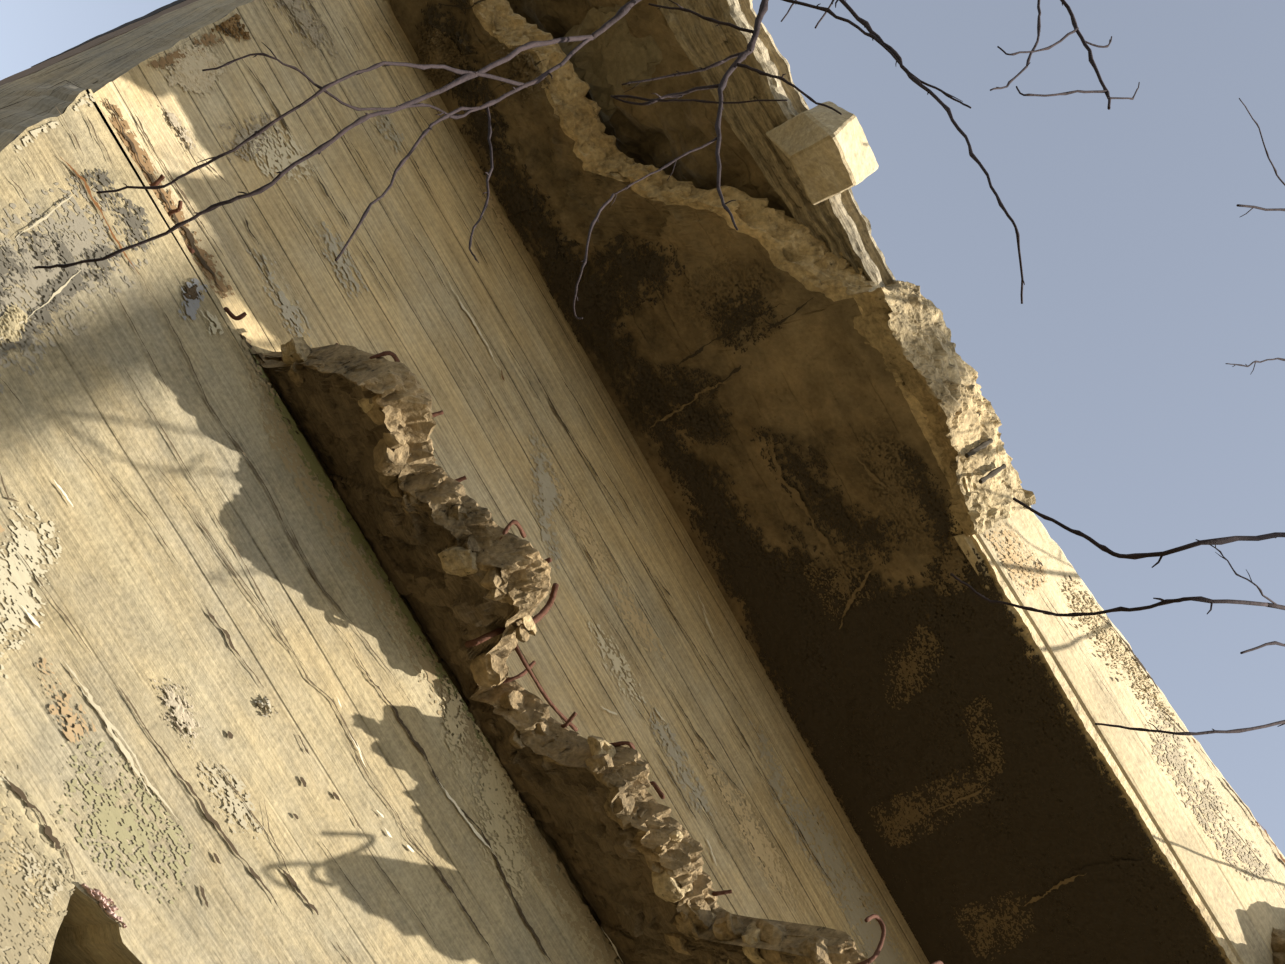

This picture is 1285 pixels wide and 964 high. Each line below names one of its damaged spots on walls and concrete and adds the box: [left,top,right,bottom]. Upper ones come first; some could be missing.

spalling [491,40,551,104]
corrosion [60,157,139,274]
corrosion [102,98,235,298]
damp [0,169,155,394]
spalling [369,351,400,362]
spalling [852,280,1036,537]
crack [0,264,552,963]
spalling [501,645,578,732]
spalling [532,583,559,624]
spalling [588,621,665,721]
spalling [436,777,496,856]
corrosion [693,736,807,913]